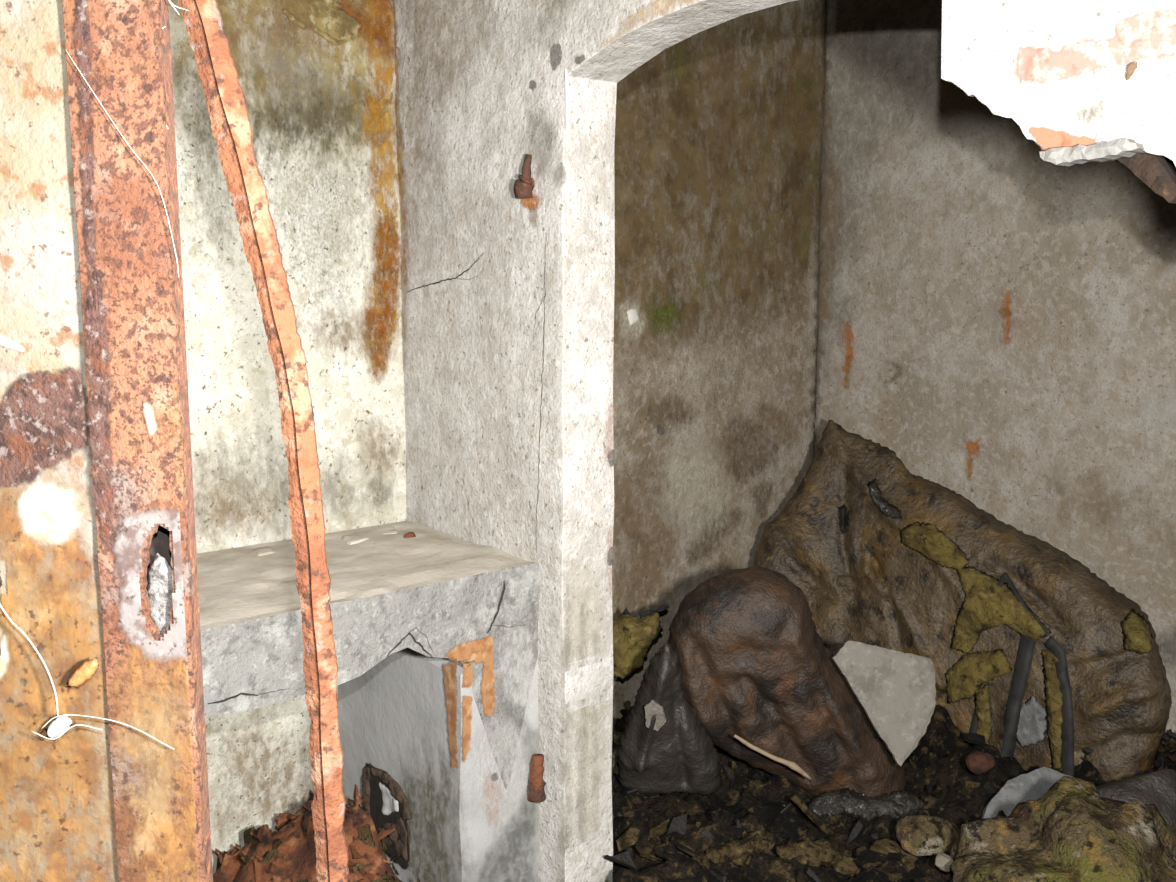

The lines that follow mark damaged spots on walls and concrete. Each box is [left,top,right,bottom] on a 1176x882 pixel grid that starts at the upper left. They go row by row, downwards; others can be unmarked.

rust [340,0,407,373]
rust [521,195,538,210]
spalling [1029,127,1176,204]
crack [408,253,484,292]
rust [0,0,198,882]
rust [178,0,349,882]
crack [387,627,434,657]
crack [208,688,289,704]